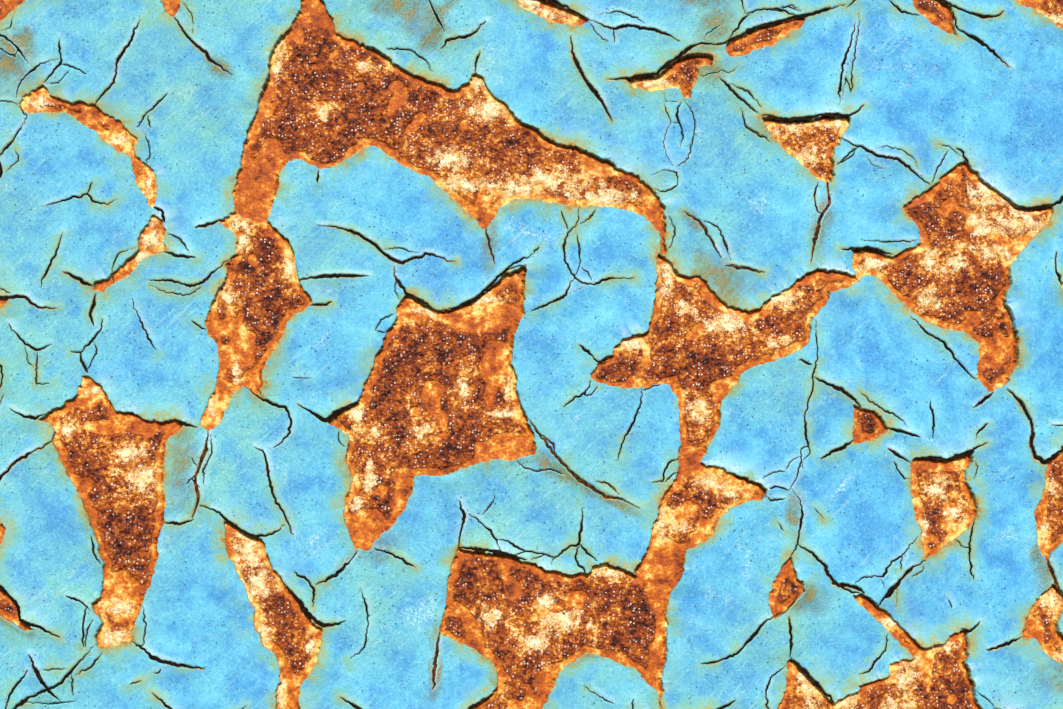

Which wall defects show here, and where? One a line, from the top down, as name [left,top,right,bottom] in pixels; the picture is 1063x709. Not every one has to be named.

rust [0,28,31,78]
peeling [41,376,183,648]
crack [0,207,233,385]
rust [376,0,449,46]
peeling [327,268,536,551]
peeling [200,0,666,431]
crack [319,206,633,333]
rust [701,259,733,294]
peeling [440,163,1052,709]
crack [546,0,969,273]
rust [786,496,799,525]
crack [763,318,1063,607]